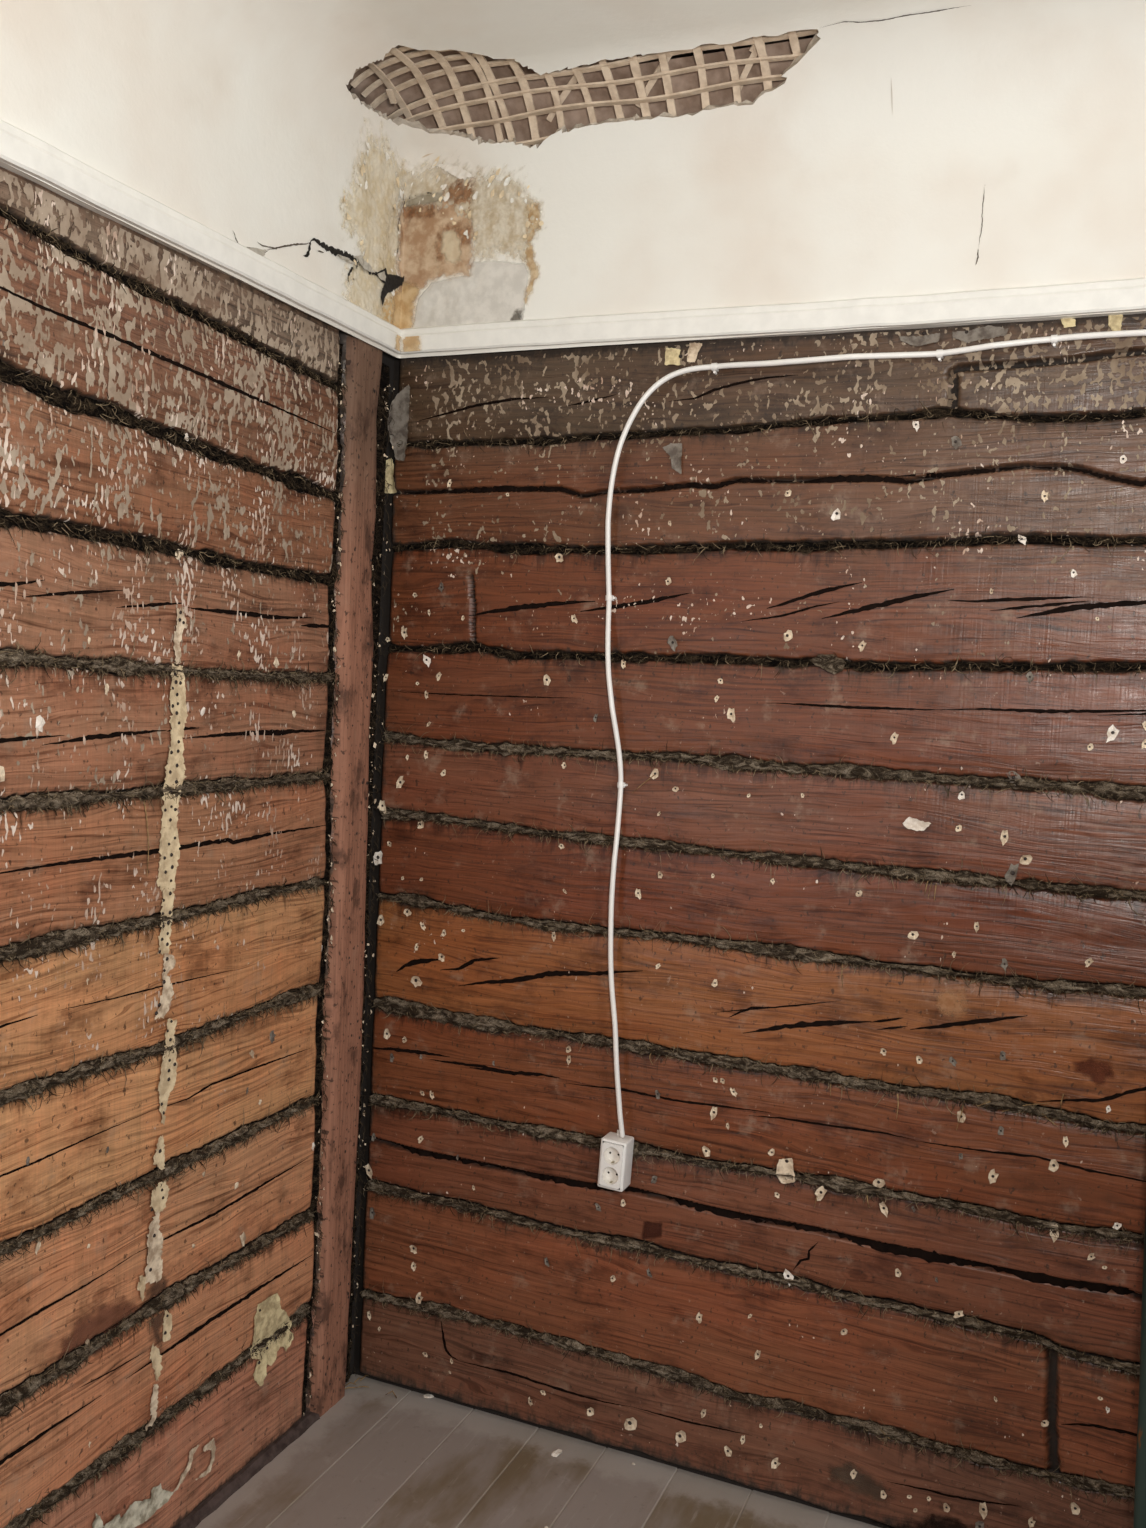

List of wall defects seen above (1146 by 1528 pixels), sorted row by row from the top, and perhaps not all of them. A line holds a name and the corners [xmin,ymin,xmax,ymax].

crack [825,5,970,27]
spalling [346,29,821,148]
peeling [393,153,544,241]
crack [232,192,432,305]
crack [0,286,335,433]
peeling [0,170,339,789]
crack [469,593,689,616]
crack [741,582,1146,622]
crack [396,957,638,986]
crack [711,1000,1028,1033]
crack [369,1135,1142,1295]
peeling [92,1438,216,1528]